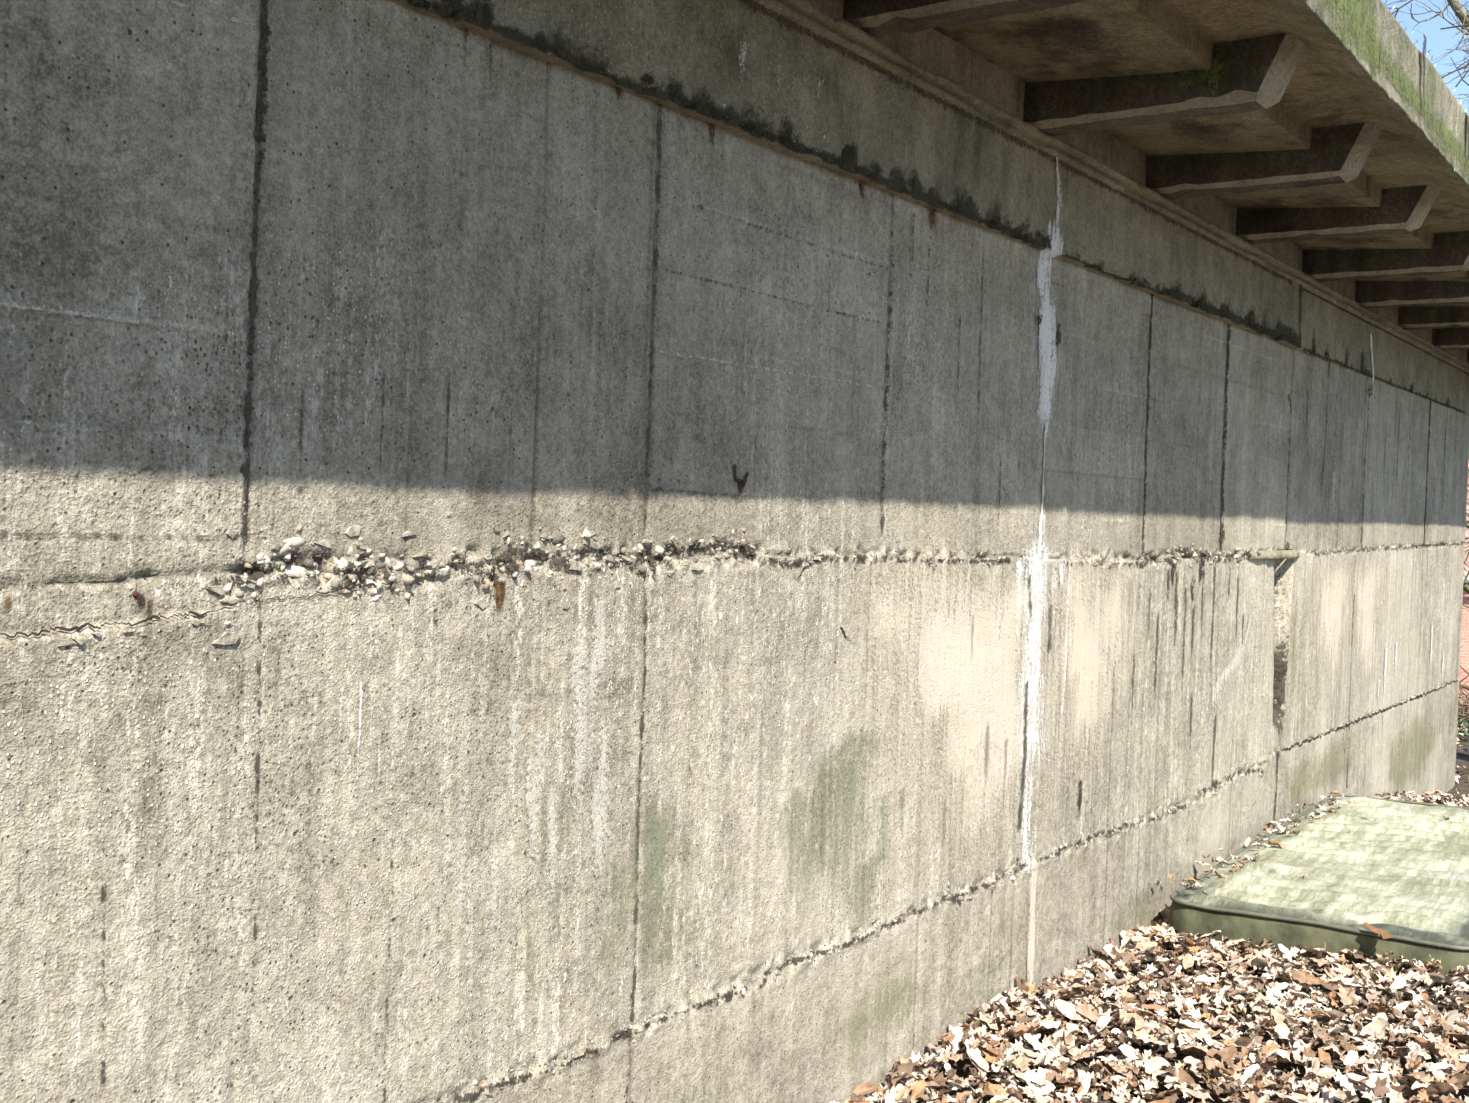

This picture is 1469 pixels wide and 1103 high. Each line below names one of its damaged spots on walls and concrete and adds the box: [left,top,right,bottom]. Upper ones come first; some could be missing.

crack [0,576,399,646]
spalling [205,524,873,645]
spalling [895,551,1005,569]
crack [1283,680,1458,751]